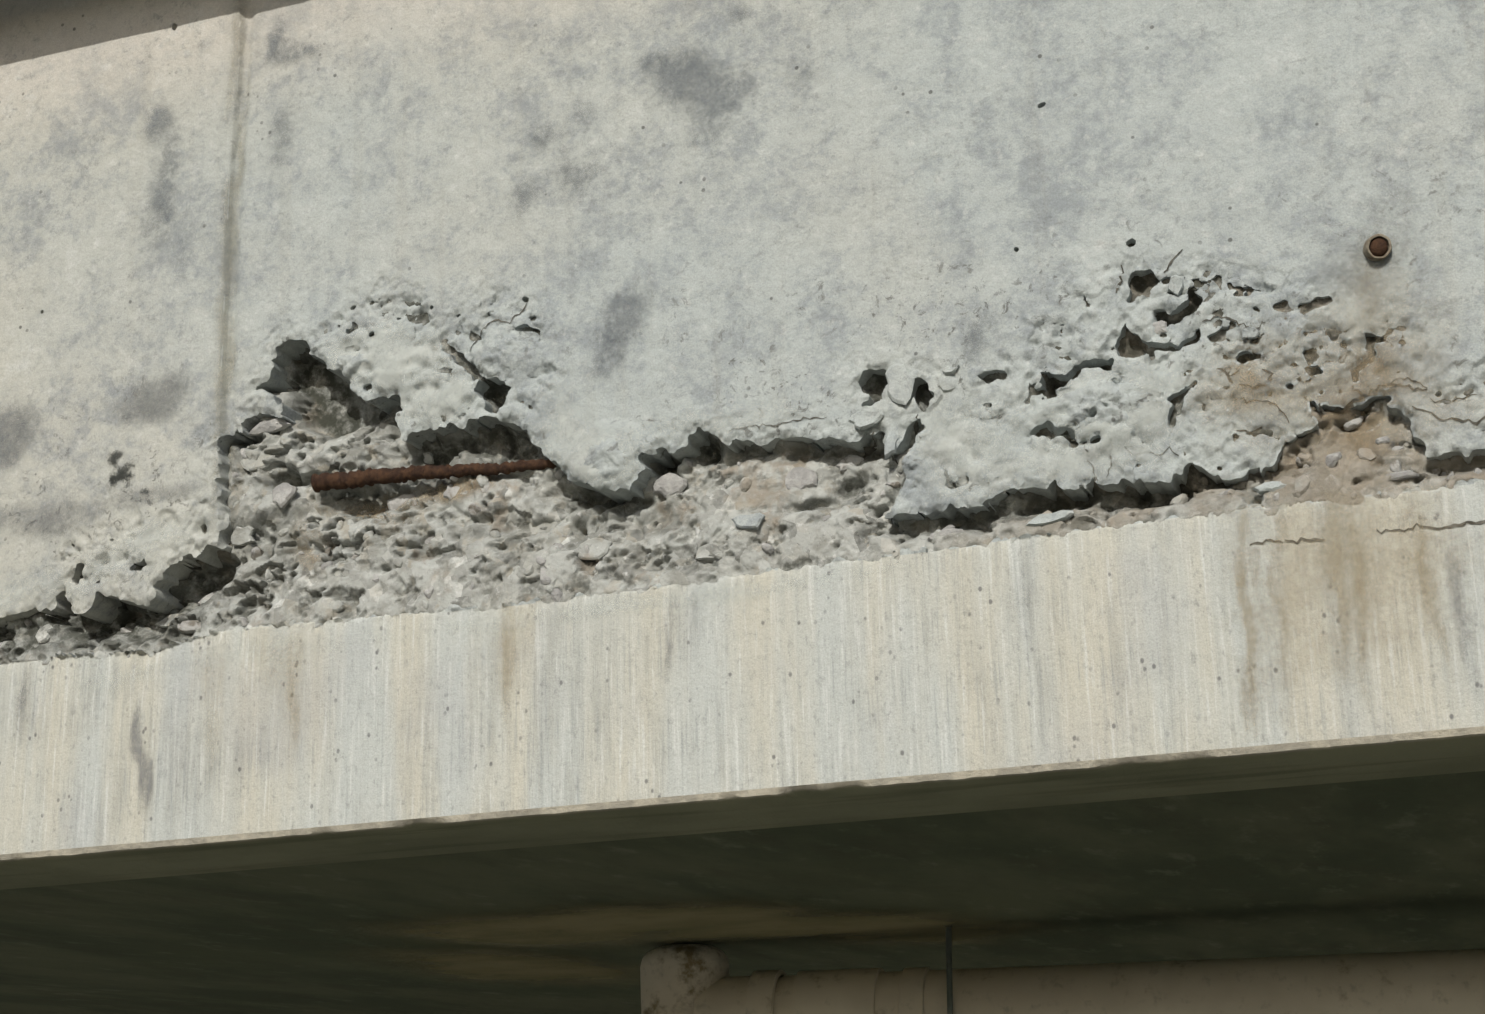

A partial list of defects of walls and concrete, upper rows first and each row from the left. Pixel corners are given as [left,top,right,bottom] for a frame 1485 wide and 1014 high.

spalling [35,271,1485,665]
crack [1376,520,1485,534]
crack [1249,537,1325,545]